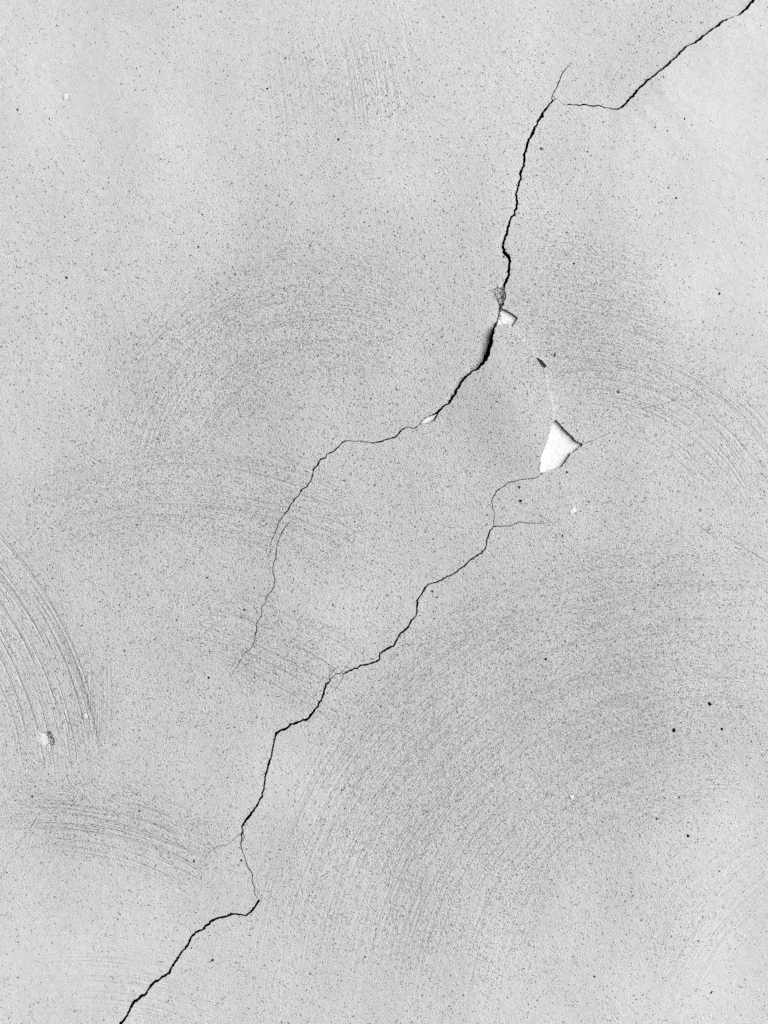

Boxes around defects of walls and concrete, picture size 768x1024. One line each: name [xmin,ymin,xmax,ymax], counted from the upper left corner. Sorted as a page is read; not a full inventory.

crack [234,0,755,671]
flaking render [422,286,583,521]
crack [119,481,598,1024]